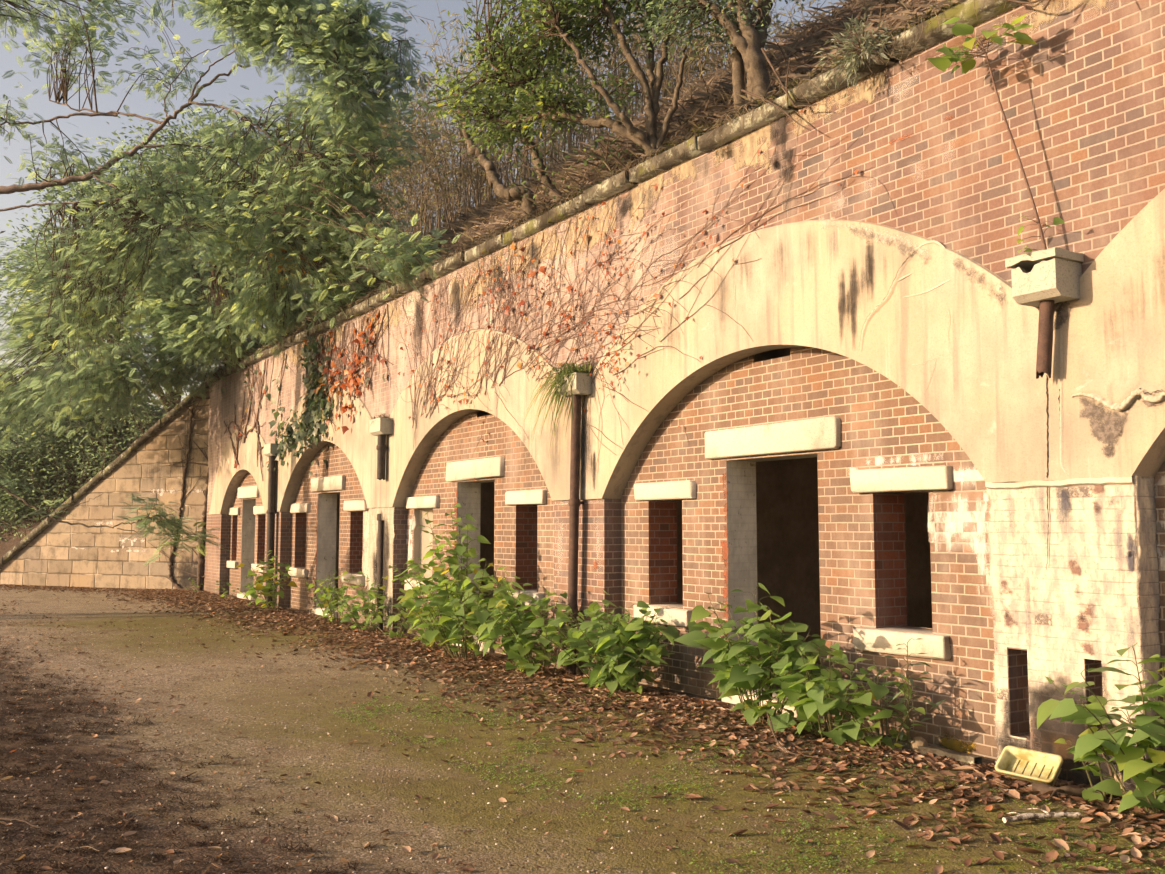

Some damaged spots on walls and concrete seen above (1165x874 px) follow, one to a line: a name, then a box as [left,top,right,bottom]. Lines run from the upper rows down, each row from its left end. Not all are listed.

damp [770,116,793,182]
damp [838,239,873,335]
damp [850,454,930,473]
damp [928,466,989,585]
crack [1046,311,1069,571]
damp [1058,491,1070,520]
spalling [1080,399,1126,456]
damp [997,676,1135,792]